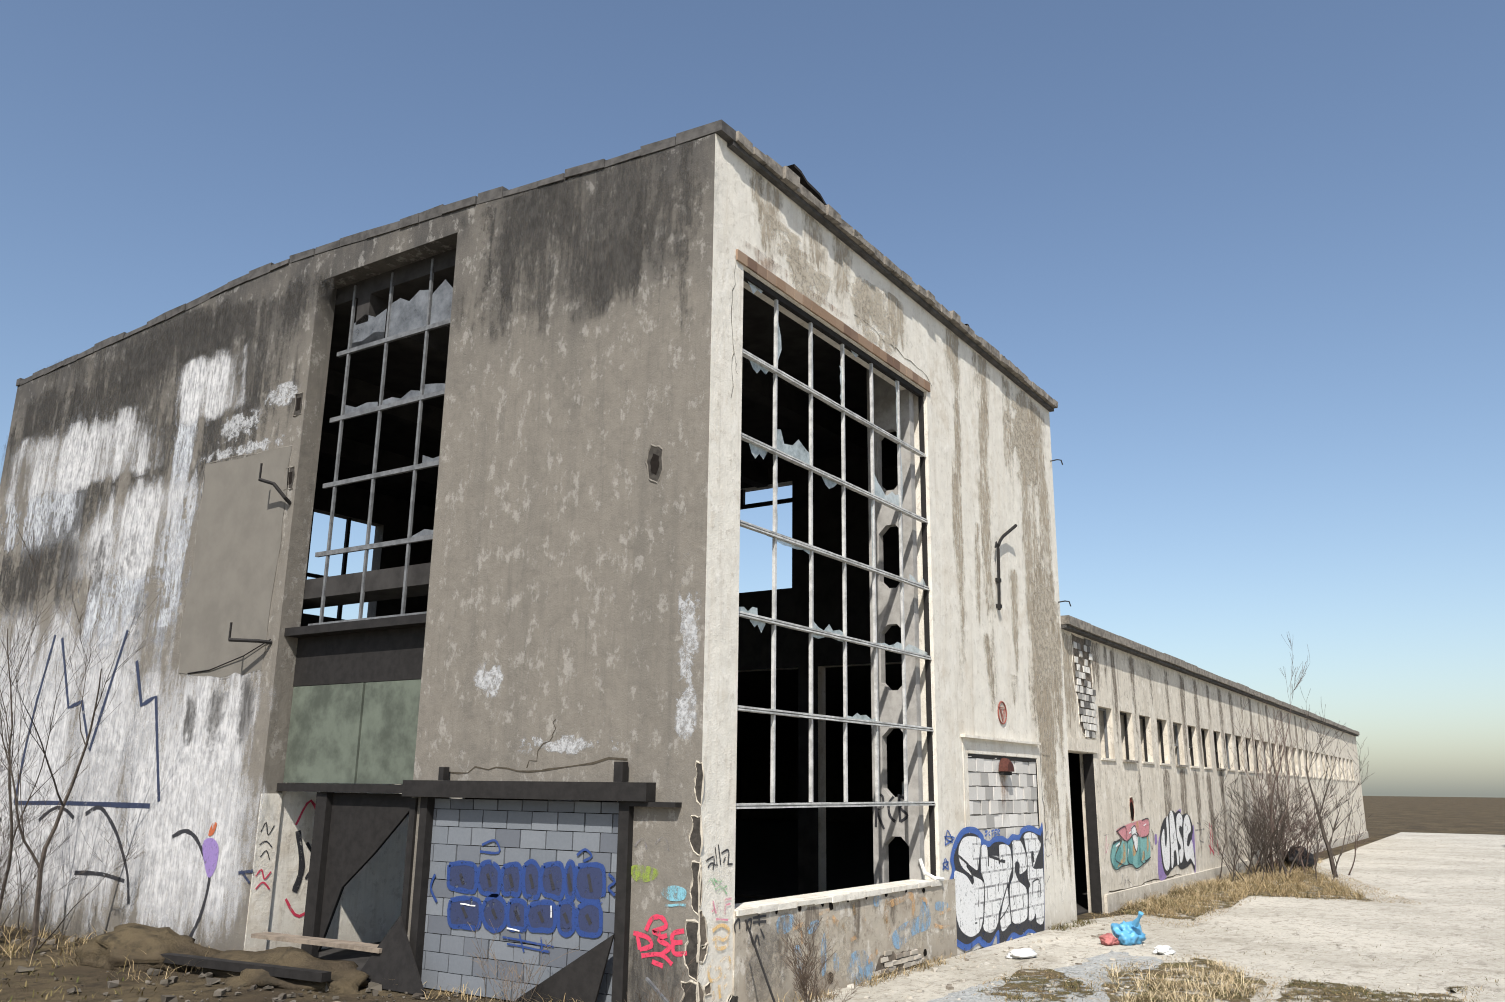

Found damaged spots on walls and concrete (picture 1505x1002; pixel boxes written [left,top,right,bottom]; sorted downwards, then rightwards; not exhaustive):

water stain [488,140,701,335]
water stain [750,171,903,347]
water stain [0,278,332,615]
water stain [183,691,223,742]
water stain [239,679,254,741]
peeling [676,593,699,739]
spalling [680,760,738,1002]